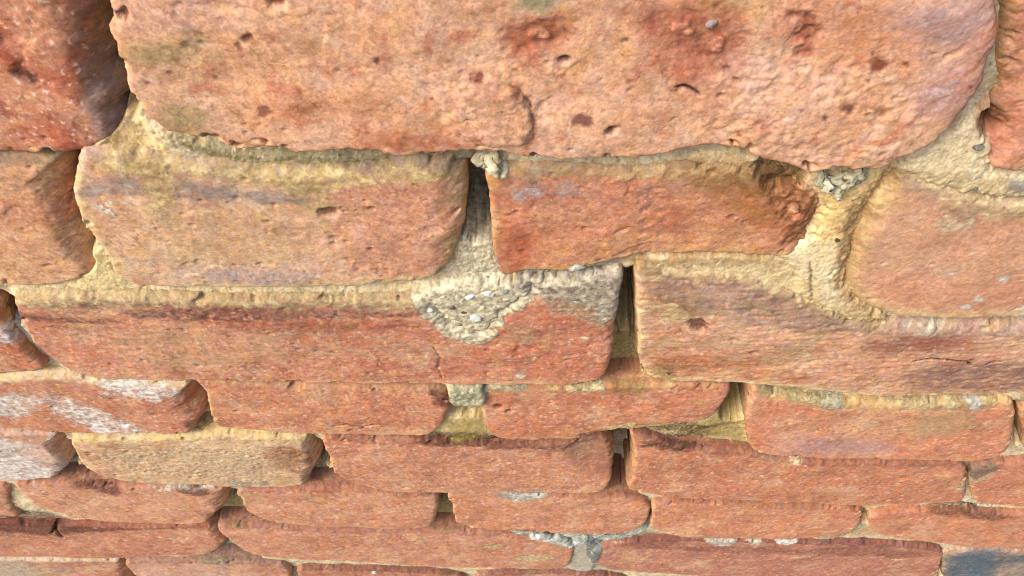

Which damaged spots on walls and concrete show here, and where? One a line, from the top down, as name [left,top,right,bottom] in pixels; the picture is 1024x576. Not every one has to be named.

damp [101,379,180,402]
damp [0,393,139,434]
damp [0,439,62,480]
damp [154,483,214,496]